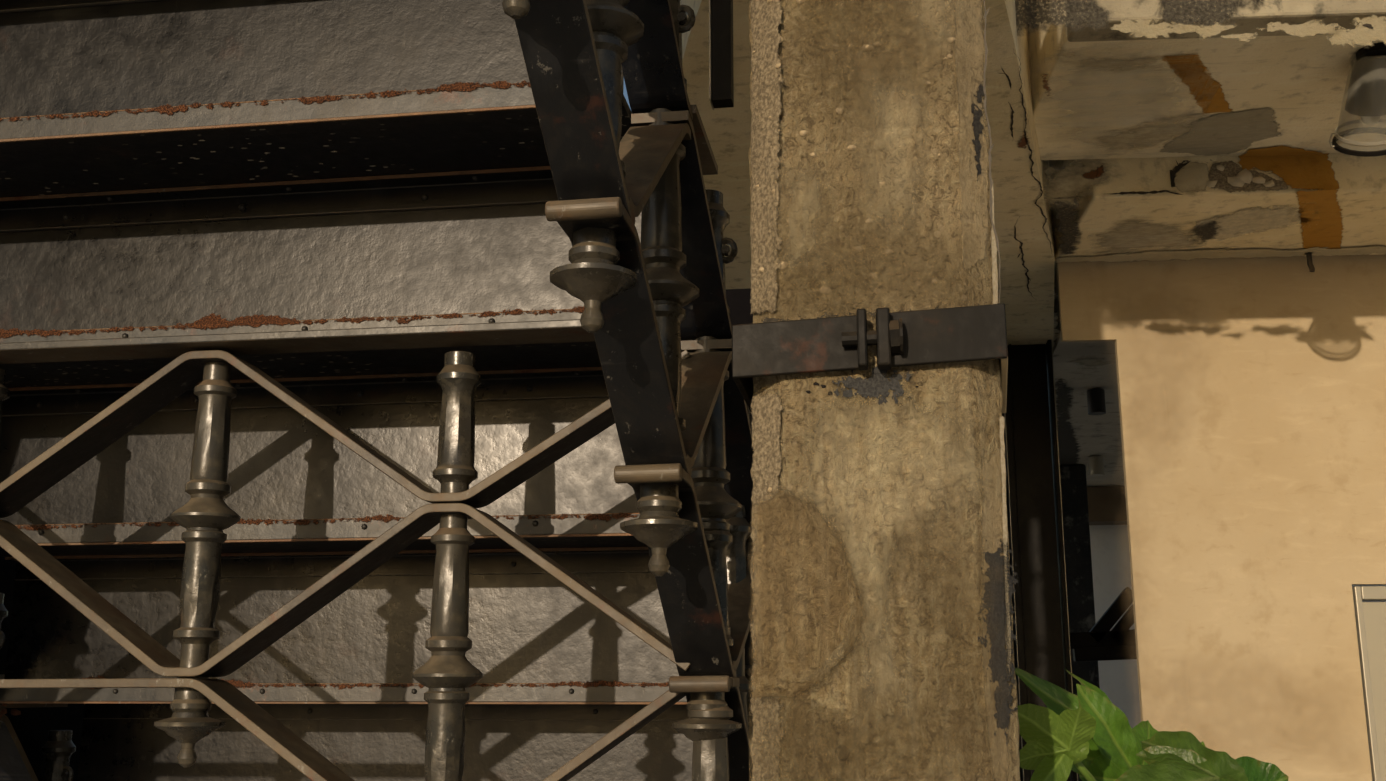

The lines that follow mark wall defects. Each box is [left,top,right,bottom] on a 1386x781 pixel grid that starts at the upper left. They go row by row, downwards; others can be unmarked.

peeling [1111,15,1386,46]
peeling [958,81,998,304]
crack [983,0,1054,302]
peeling [1170,160,1308,244]
peeling [977,416,1019,745]